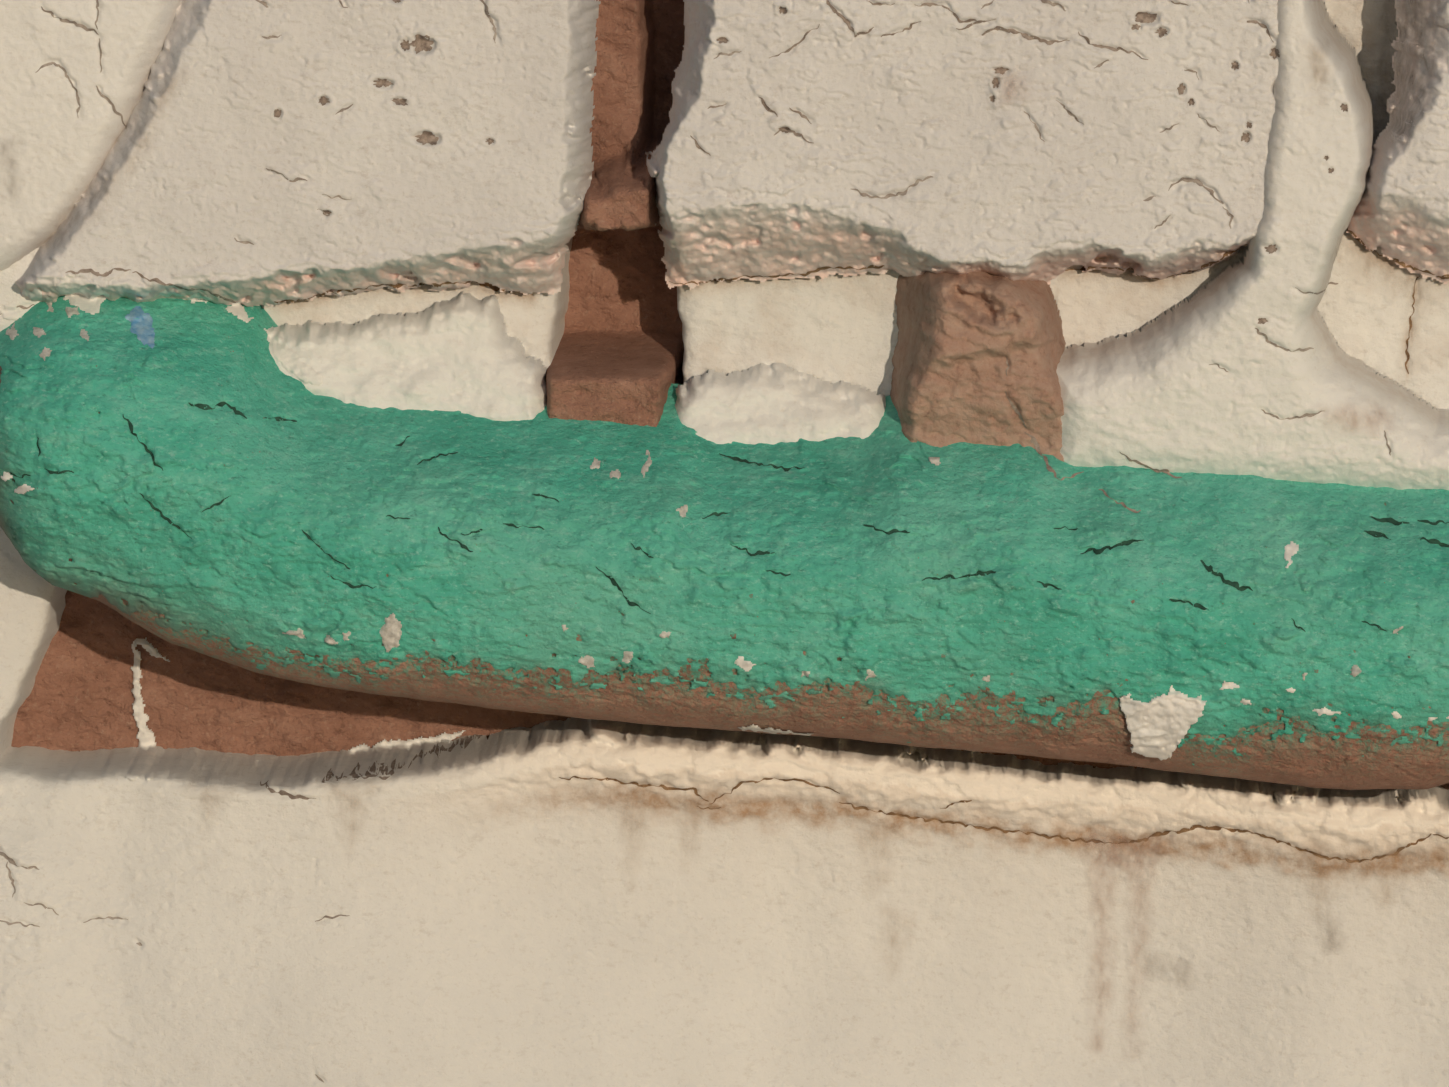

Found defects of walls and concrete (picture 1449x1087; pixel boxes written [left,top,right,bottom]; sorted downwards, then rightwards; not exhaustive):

crack [35,0,127,128]
crack [714,0,1148,68]
crack [759,97,813,143]
crack [123,415,229,539]
crack [1364,516,1449,547]
crack [1169,560,1253,610]
flaking render [126,637,170,781]
peeling [1119,685,1207,760]
peeling [1219,681,1251,705]
peeling [1313,707,1341,716]
crack [559,776,1449,863]
crack [0,852,142,946]